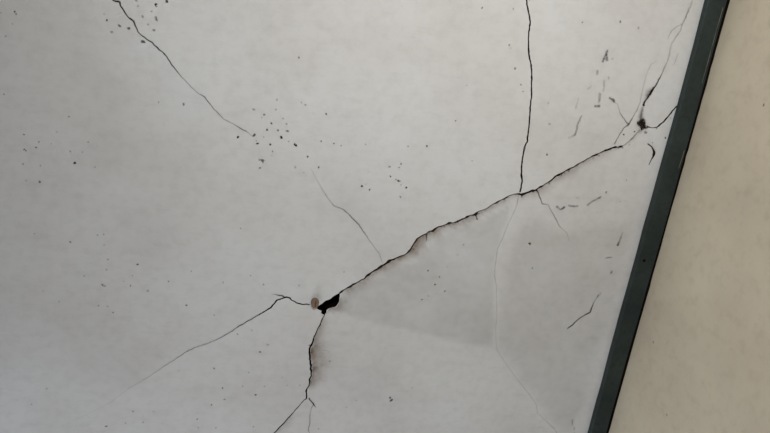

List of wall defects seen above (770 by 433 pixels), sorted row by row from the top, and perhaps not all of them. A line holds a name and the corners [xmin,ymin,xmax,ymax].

crack [113,0,180,75]
crack [218,294,325,433]
crack [339,0,623,294]
crack [606,0,730,433]